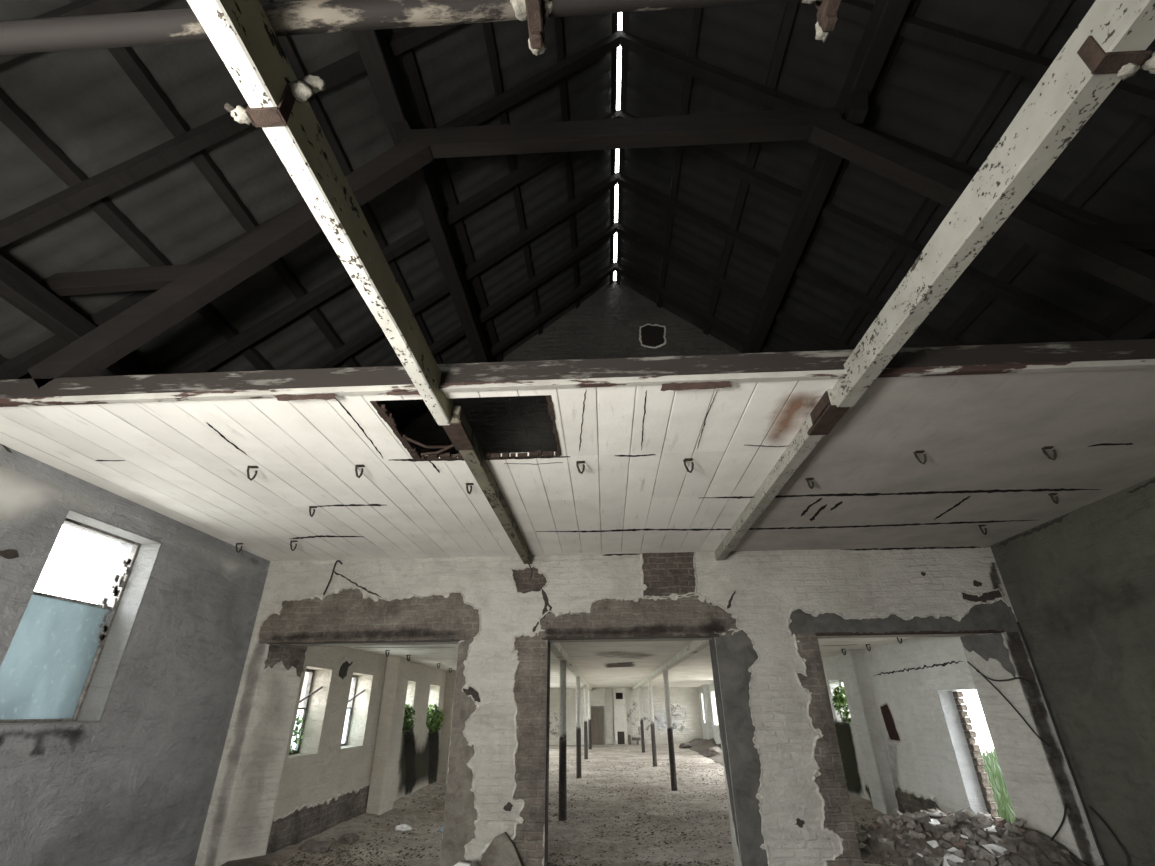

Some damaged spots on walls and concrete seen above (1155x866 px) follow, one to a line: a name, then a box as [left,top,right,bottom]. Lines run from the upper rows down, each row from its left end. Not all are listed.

crack [206,422,247,455]
peeling [274,393,335,401]
spalling [370,391,463,461]
crack [335,392,586,473]
spalling [483,395,561,459]
crack [616,391,656,457]
rust [774,397,813,438]
crack [536,479,1155,556]
crack [334,571,381,597]
flaking render [257,586,490,866]
flaking render [503,552,771,866]
flaking render [786,580,1020,866]